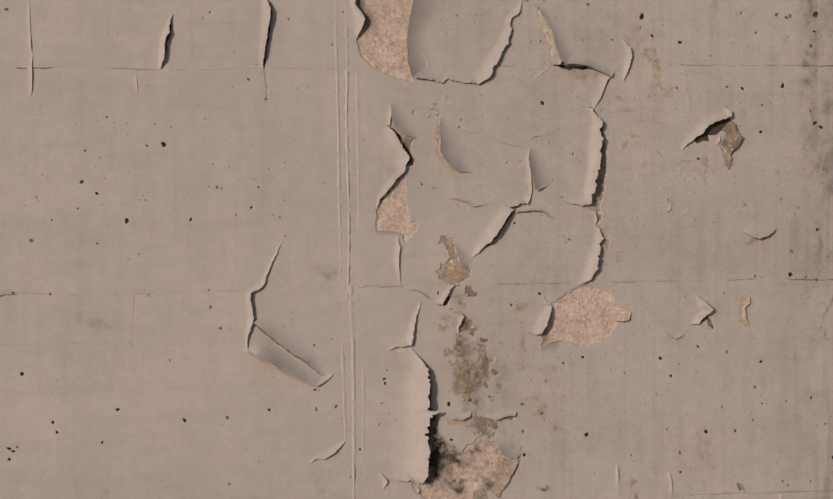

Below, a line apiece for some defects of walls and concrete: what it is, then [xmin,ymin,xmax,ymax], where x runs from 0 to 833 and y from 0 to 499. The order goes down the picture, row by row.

peeling [157,14,173,69]
peeling [256,0,272,86]
peeling [349,0,522,84]
peeling [525,1,632,357]
peeling [676,104,743,170]
peeling [244,239,334,387]
peeling [375,102,557,499]
peeling [662,295,714,339]
damp [425,416,460,482]